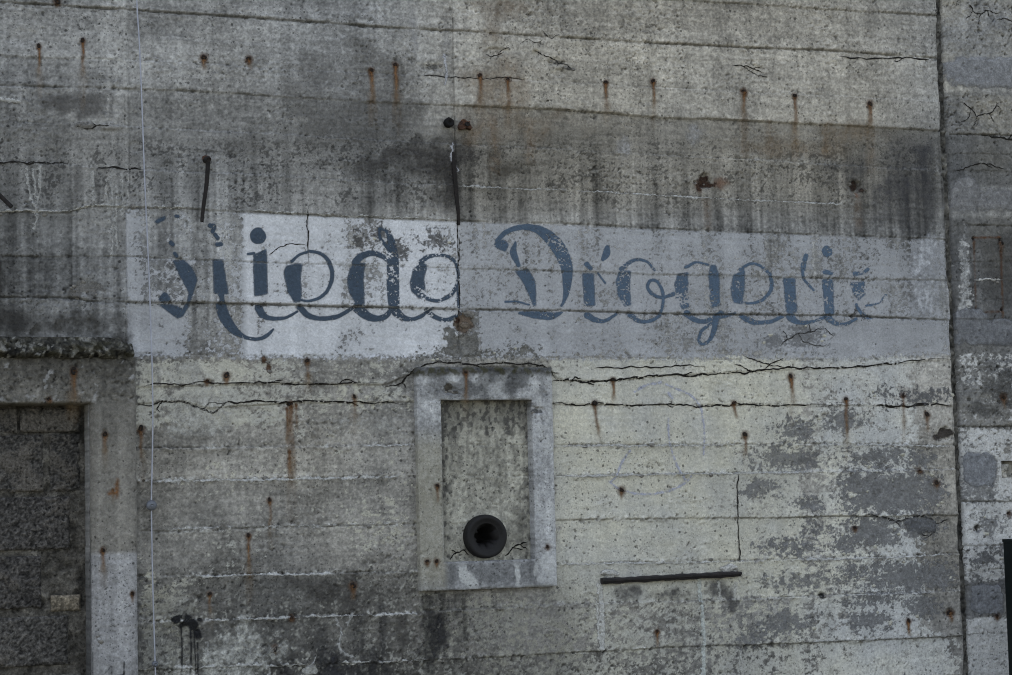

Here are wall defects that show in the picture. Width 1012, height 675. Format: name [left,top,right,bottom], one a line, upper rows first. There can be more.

crack [966,4,1011,24]
leakage [357,140,500,194]
crack [138,325,949,414]
corrosion [286,402,297,438]
leakage [160,571,369,675]
leakage [373,610,448,665]